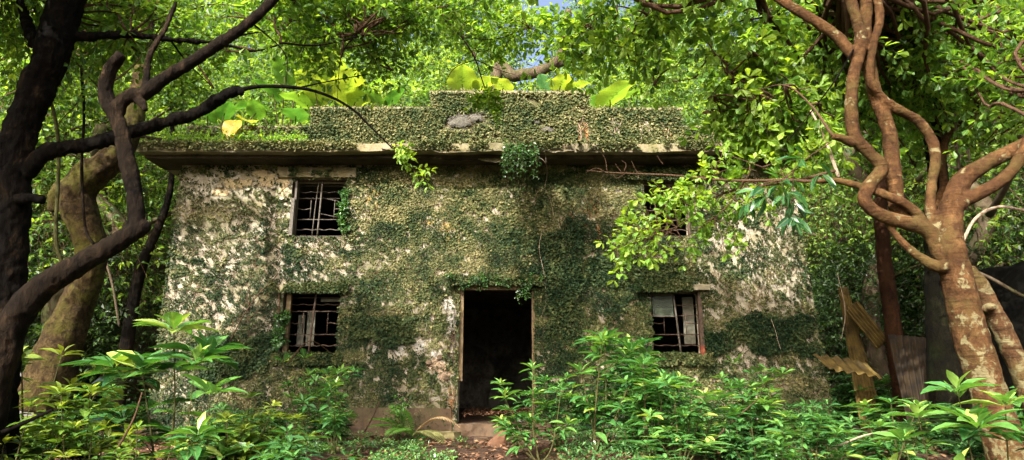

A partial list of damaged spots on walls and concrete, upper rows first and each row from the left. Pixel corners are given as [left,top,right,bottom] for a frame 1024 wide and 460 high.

peeling [442,299,457,335]
spalling [372,339,451,383]